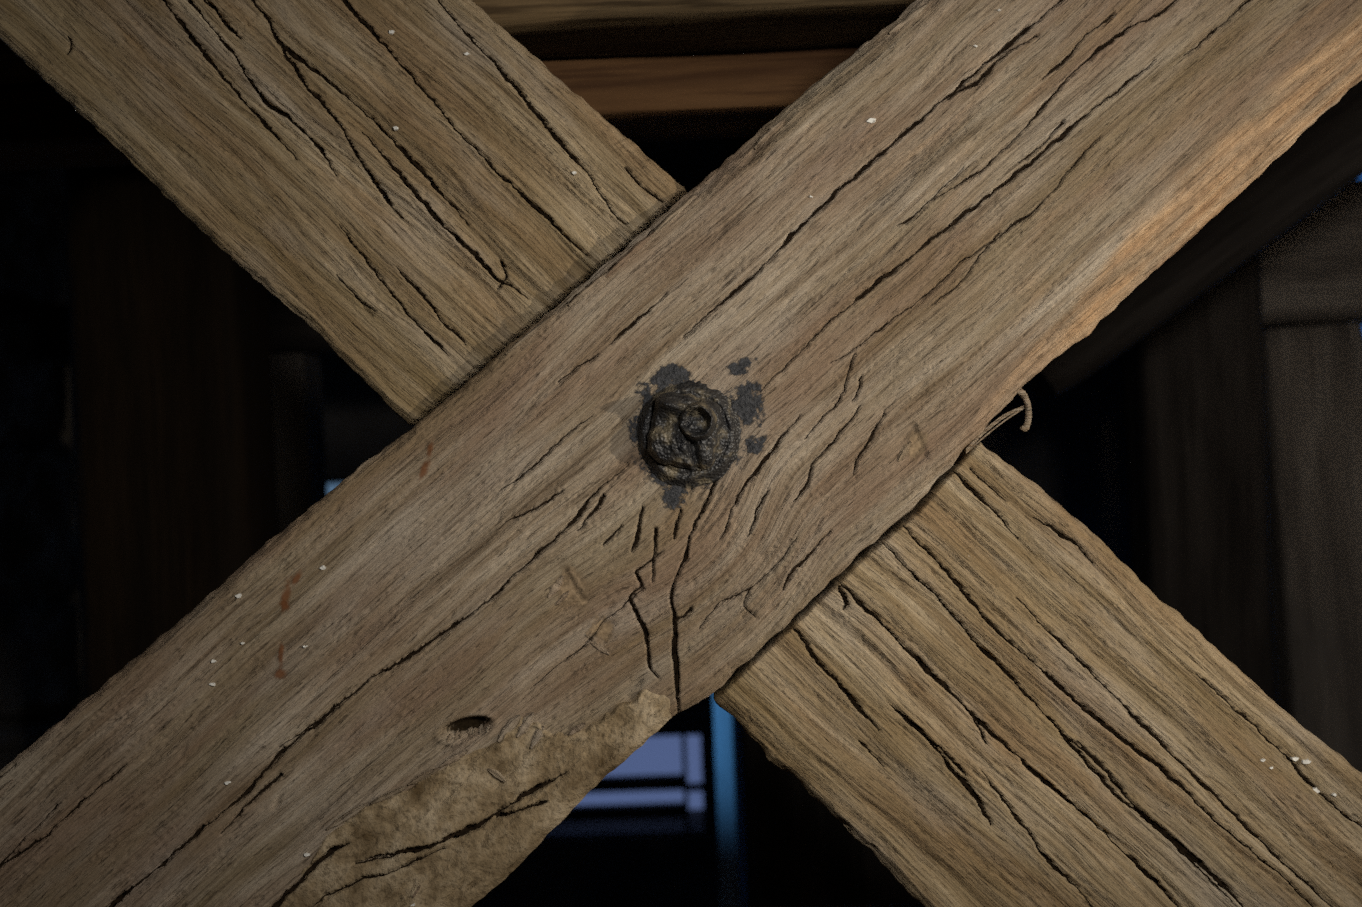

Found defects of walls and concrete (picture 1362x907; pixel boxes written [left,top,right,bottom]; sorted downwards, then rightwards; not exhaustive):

crack [1185,0,1250,55]
crack [109,0,1179,907]
crack [0,764,127,867]
crack [879,521,1333,907]
crack [1197,674,1362,827]